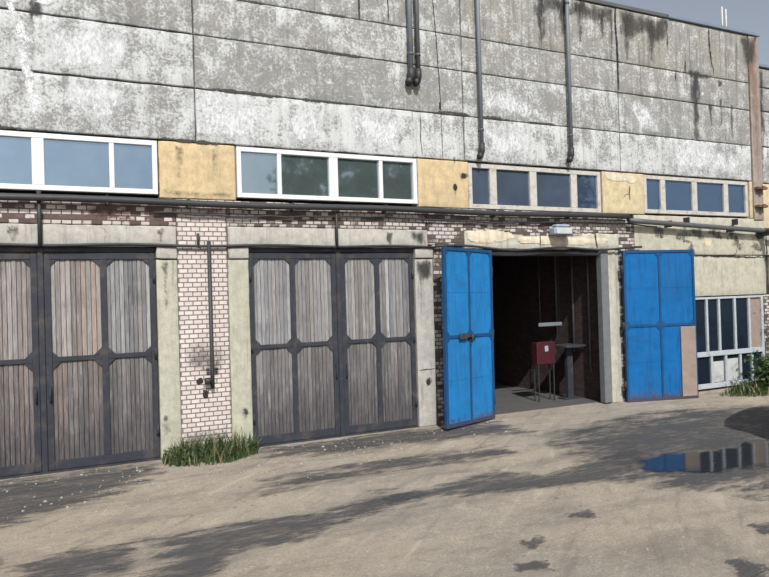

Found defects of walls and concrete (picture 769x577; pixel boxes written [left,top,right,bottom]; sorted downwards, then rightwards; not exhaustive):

water stain [29,0,41,18]
water stain [536,0,612,40]
water stain [623,12,668,53]
water stain [689,71,708,136]